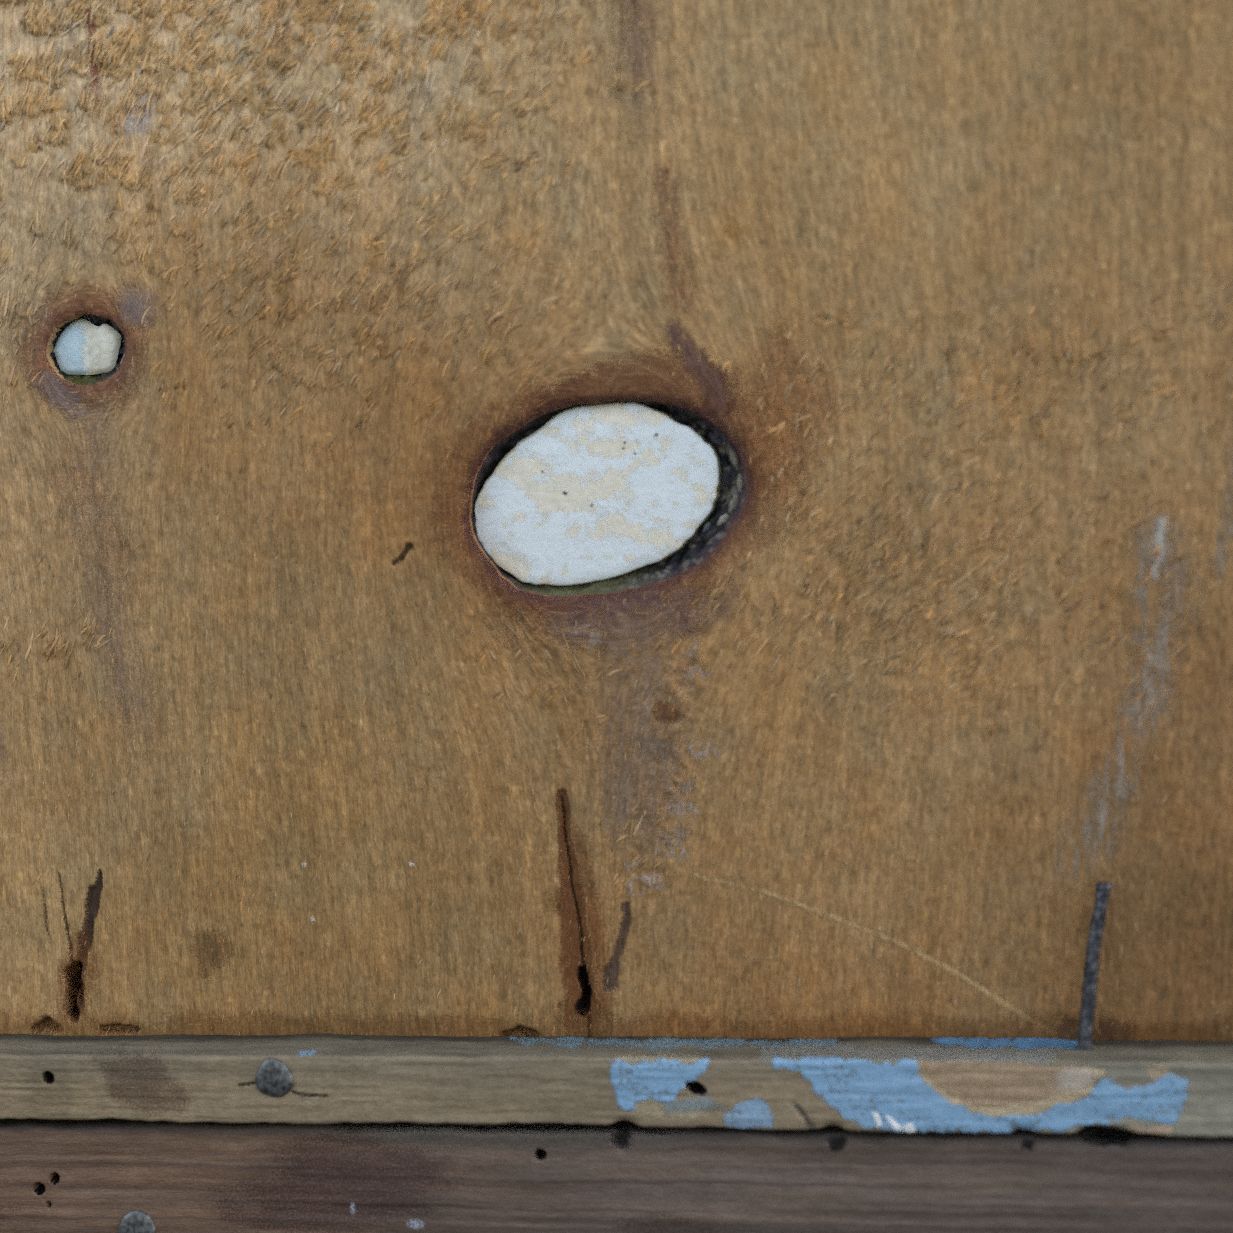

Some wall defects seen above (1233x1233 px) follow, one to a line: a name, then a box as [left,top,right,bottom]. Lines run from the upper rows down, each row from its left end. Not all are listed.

peeling [871,1112,916,1133]
peeling [1083,1131,1130,1147]